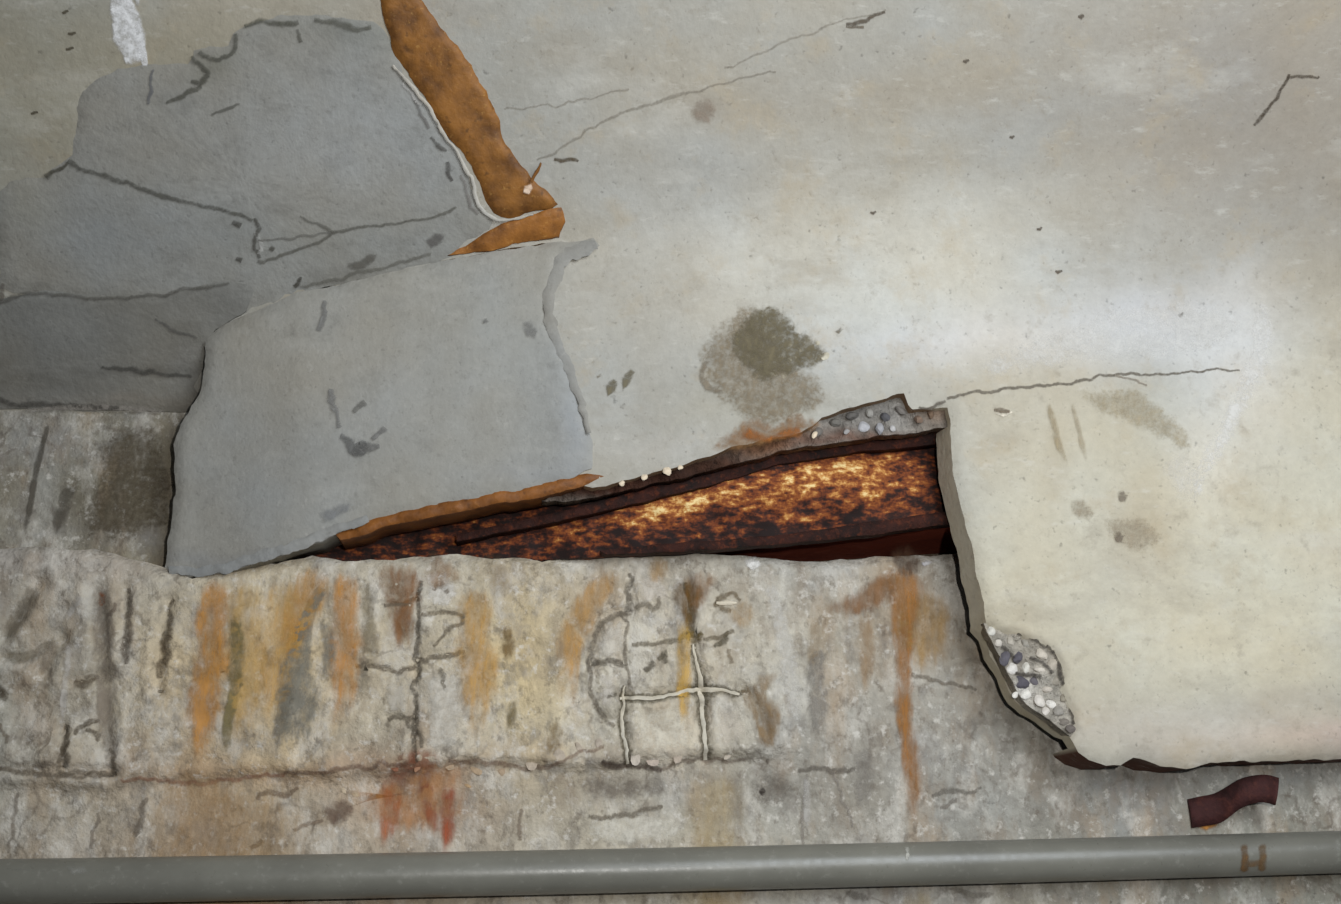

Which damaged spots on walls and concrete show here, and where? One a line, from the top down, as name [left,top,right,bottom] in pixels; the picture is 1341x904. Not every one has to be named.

rust [381,0,565,256]
crack [1254,74,1319,126]
spalling [328,389,387,456]
spalling [542,398,947,506]
water stain [700,307,824,421]
crack [919,368,1240,410]
rust [336,474,603,549]
rust [600,512,950,558]
crack [0,580,465,846]
crack [555,574,747,772]
rust [845,551,918,788]
spalling [981,623,1076,737]